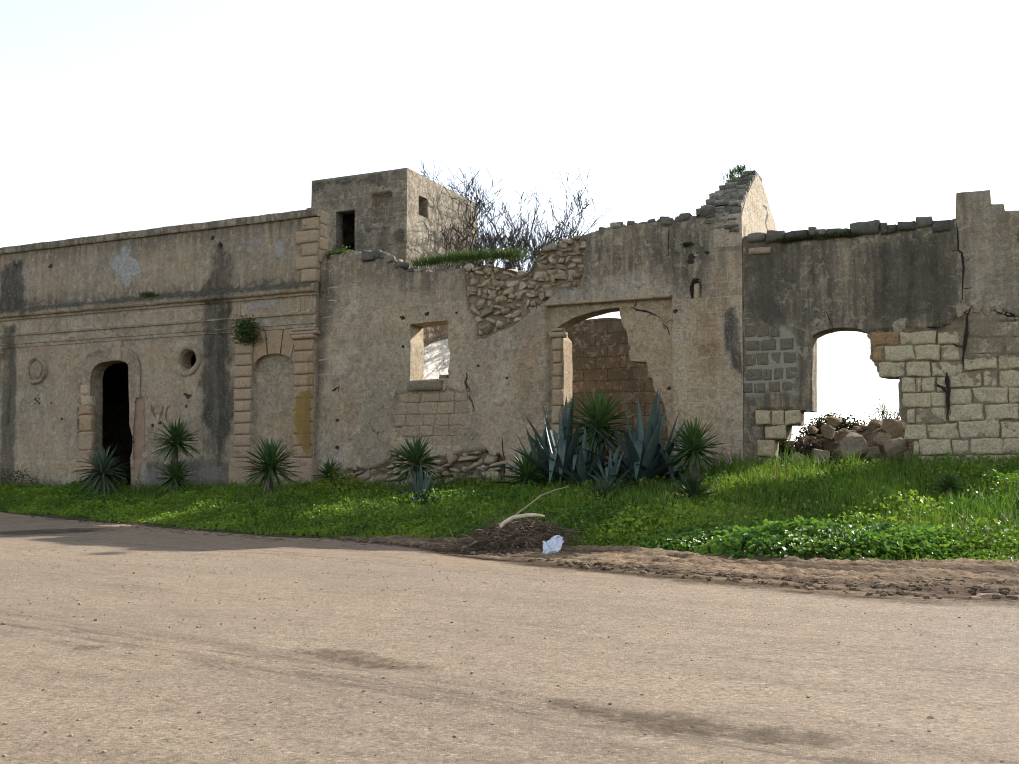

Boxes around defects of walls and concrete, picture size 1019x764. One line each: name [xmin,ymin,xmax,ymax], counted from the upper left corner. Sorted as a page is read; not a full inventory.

water stain [0,327,16,483]
water stain [0,260,29,314]
water stain [182,244,234,486]
peeling [743,318,799,399]
spalling [755,410,804,457]
peeling [867,298,1019,469]
crack [927,223,972,419]
crack [996,311,1016,321]